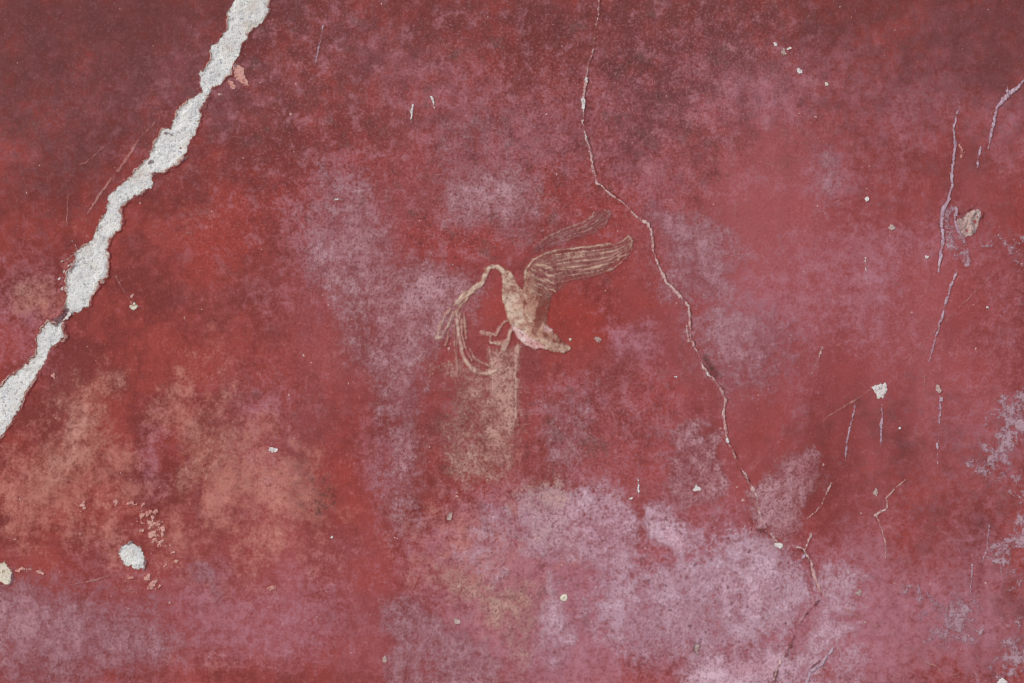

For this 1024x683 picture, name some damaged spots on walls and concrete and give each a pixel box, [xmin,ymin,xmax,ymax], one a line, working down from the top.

crack [924,80,1024,464]
crack [52,308,72,326]
crack [581,0,824,620]
flaking render [872,382,888,399]
spalling [113,500,178,590]
crack [773,644,792,681]
crack [805,648,833,683]